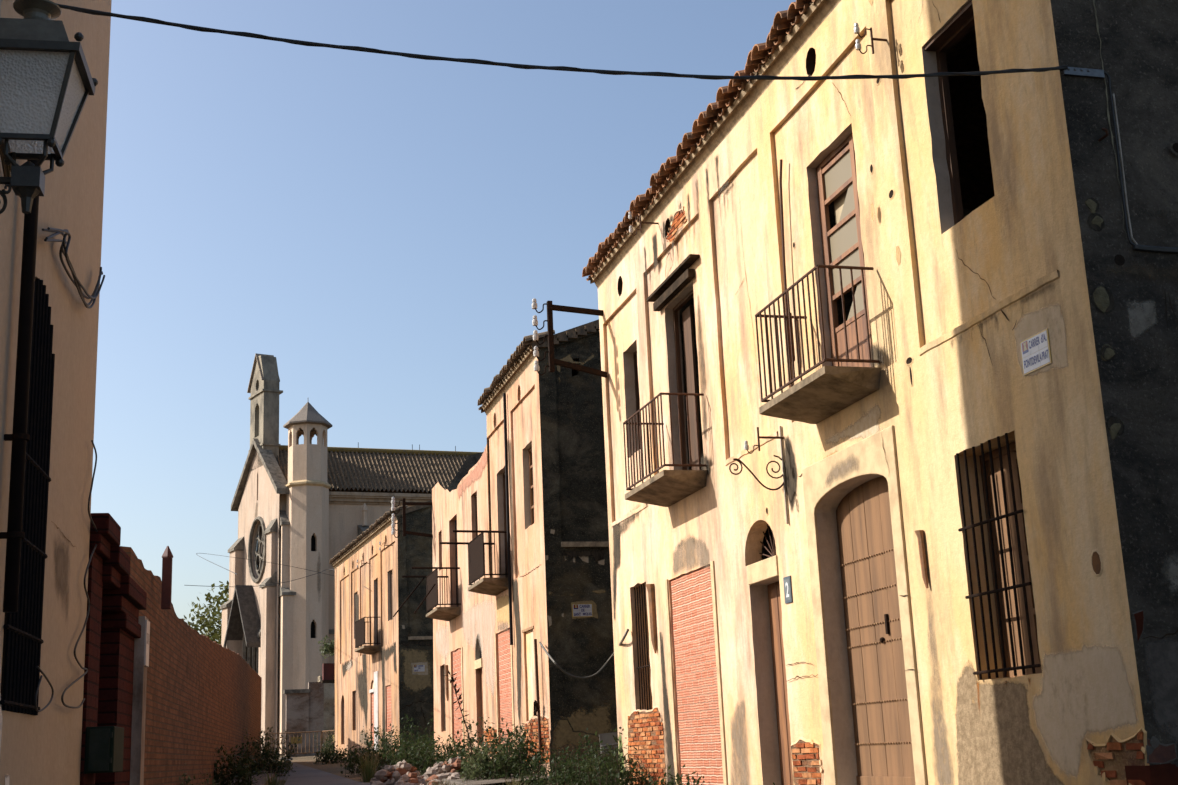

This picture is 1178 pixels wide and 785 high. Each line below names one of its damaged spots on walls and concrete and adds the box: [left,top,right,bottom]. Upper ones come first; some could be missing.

leakage [562,506,639,619]
peeling [524,705,614,770]
spalling [628,706,667,785]
spalling [791,737,824,785]
leakage [932,645,1137,785]
spalling [1086,727,1177,785]
leakage [1144,639,1178,744]